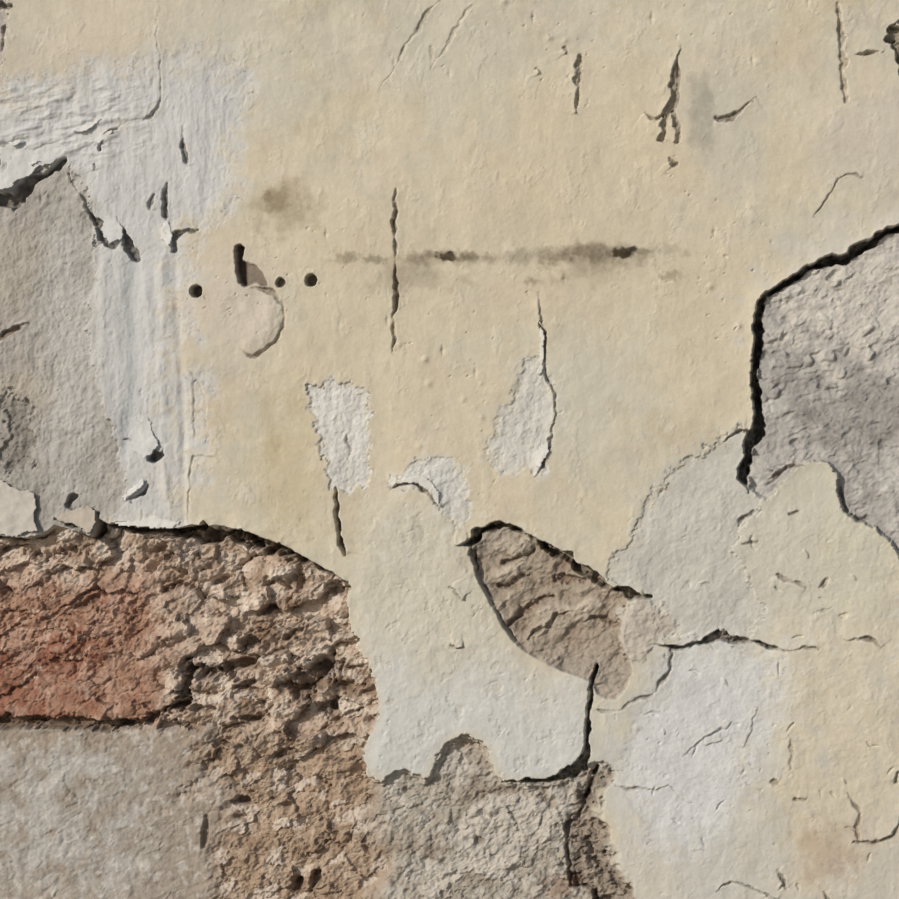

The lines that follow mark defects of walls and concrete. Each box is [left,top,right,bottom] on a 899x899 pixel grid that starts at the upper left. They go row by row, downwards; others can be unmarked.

spalling [0,46,635,899]
crack [391,189,400,354]
peeling [476,233,899,700]
crack [724,225,899,495]
crack [814,173,865,216]
crack [502,629,821,899]
peeling [618,641,787,855]
crack [845,636,884,649]
crack [853,824,899,846]
crack [891,771,899,785]